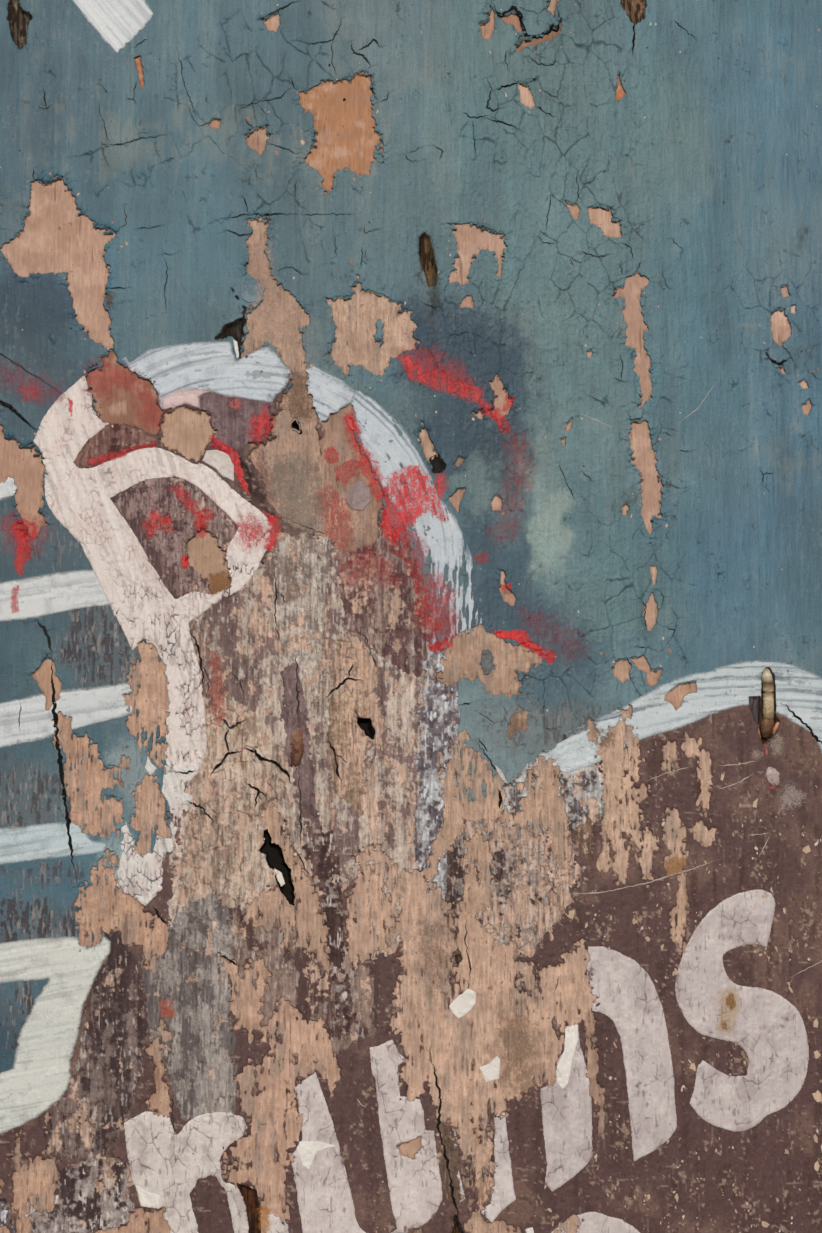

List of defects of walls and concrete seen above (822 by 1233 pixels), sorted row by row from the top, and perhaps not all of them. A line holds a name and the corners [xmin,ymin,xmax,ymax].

crack [99,82,166,147]
crack [178,51,207,126]
crack [238,79,295,152]
peeling [299,70,383,195]
crack [306,22,389,101]
crack [466,5,562,150]
crack [110,207,171,312]
crack [228,170,379,267]
crack [540,177,683,287]
crack [639,591,675,648]
crack [38,622,79,886]
peeling [0,173,717,1233]